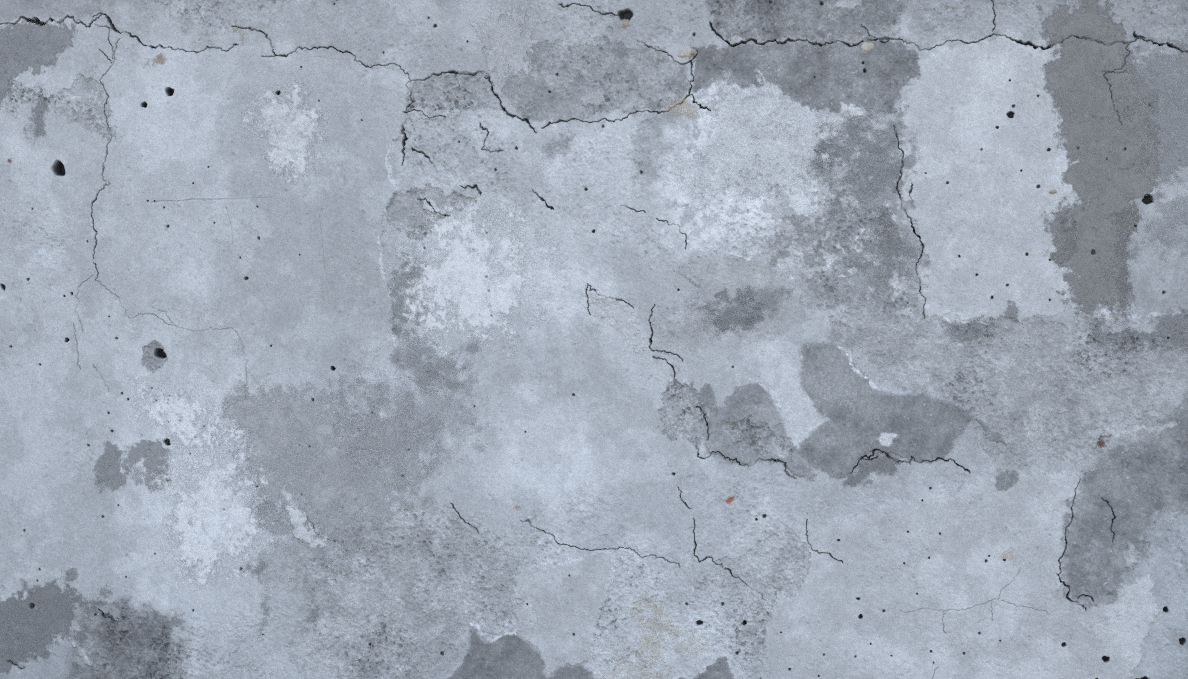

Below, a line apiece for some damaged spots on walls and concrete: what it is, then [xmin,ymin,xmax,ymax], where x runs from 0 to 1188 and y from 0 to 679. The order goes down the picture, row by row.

crack [1127,31,1188,56]
spalling [387,184,479,241]
crack [0,0,1062,413]
spalling [403,0,1188,608]
crack [451,503,479,534]
crack [521,488,767,602]
crack [904,479,1117,634]